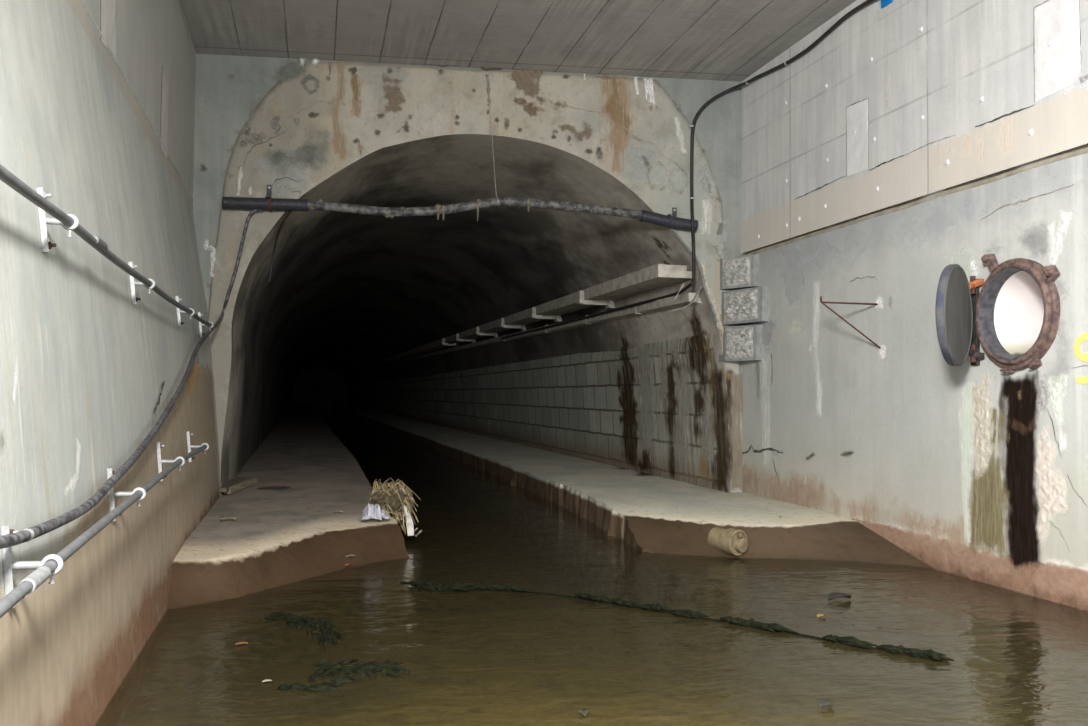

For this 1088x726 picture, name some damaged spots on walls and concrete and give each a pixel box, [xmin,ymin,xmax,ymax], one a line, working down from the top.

corrosion [329,62,360,159]
corrosion [602,76,629,171]
water stain [1024,215,1068,263]
water stain [617,312,743,493]
peeling [972,376,993,475]
water stain [851,351,1088,632]